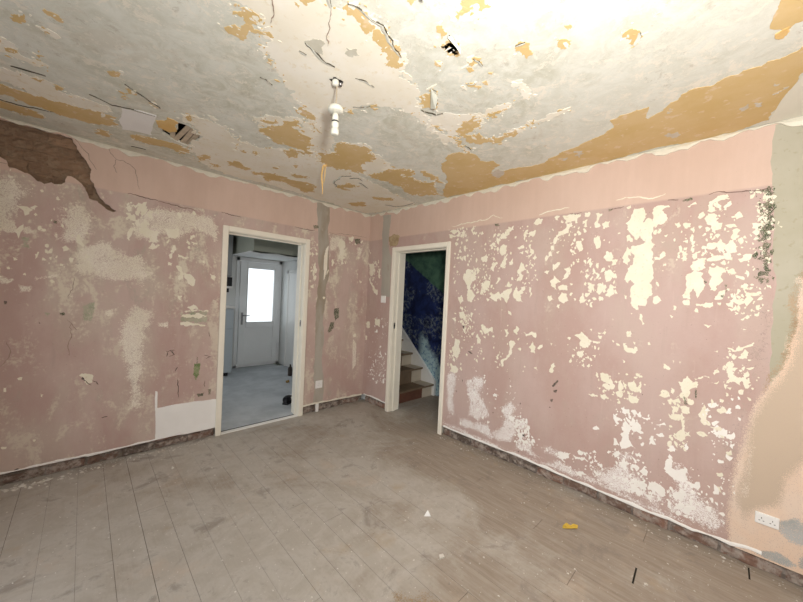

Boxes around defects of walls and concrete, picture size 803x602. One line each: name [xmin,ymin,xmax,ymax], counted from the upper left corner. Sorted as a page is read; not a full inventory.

peeling [130,0,803,213]
peeling [126,202,220,286]
peeling [310,236,381,295]
peeling [104,304,168,410]
peeling [352,319,388,384]
flaking render [443,194,803,587]
flaking render [0,428,214,486]